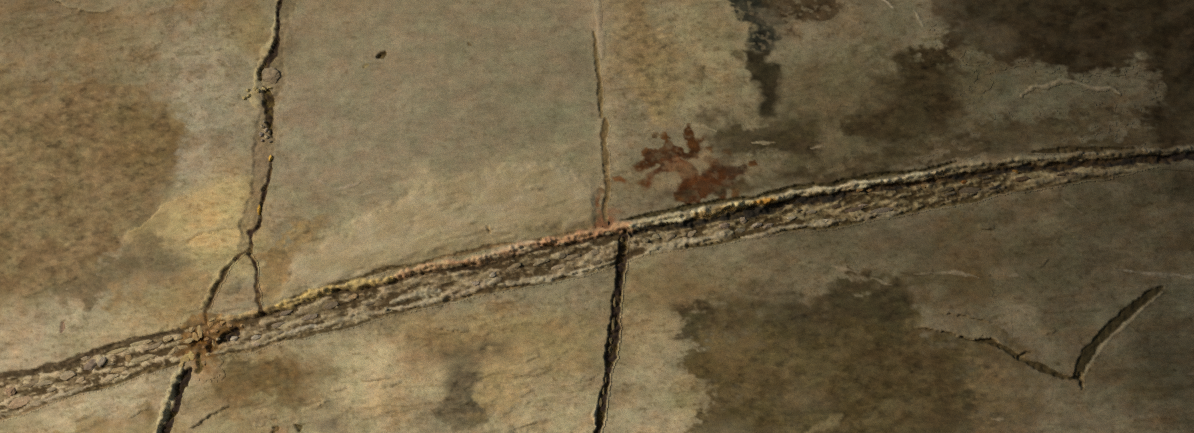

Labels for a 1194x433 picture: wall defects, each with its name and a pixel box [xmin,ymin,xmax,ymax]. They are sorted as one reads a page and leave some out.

crack [198,0,1137,433]
rust [595,121,759,228]
water stain [601,0,1194,215]
crack [0,362,193,433]
water stain [385,299,614,432]
water stain [622,259,1054,433]